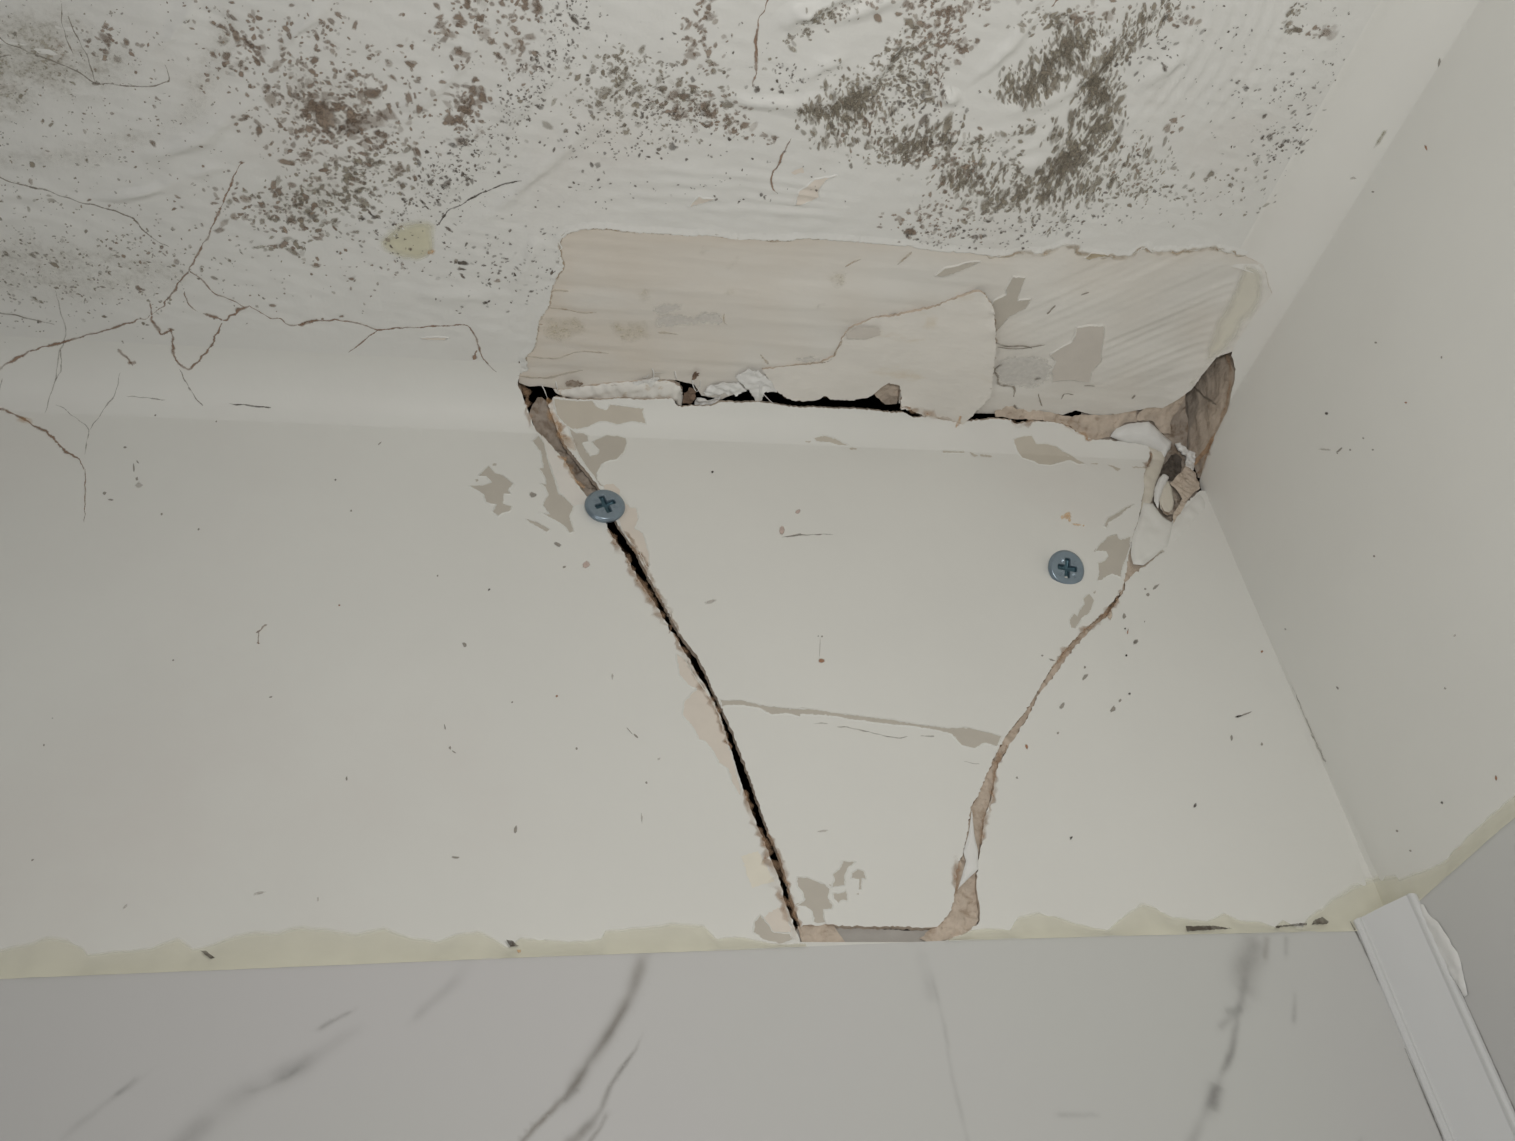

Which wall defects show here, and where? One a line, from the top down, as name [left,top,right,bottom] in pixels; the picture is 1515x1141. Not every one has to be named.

crack [0,161,489,518]
crack [440,181,517,222]
crack [529,397,597,497]
leakage [0,0,1349,332]
peeling [468,221,1272,945]
crack [744,598,1118,942]
spalling [1276,917,1329,928]